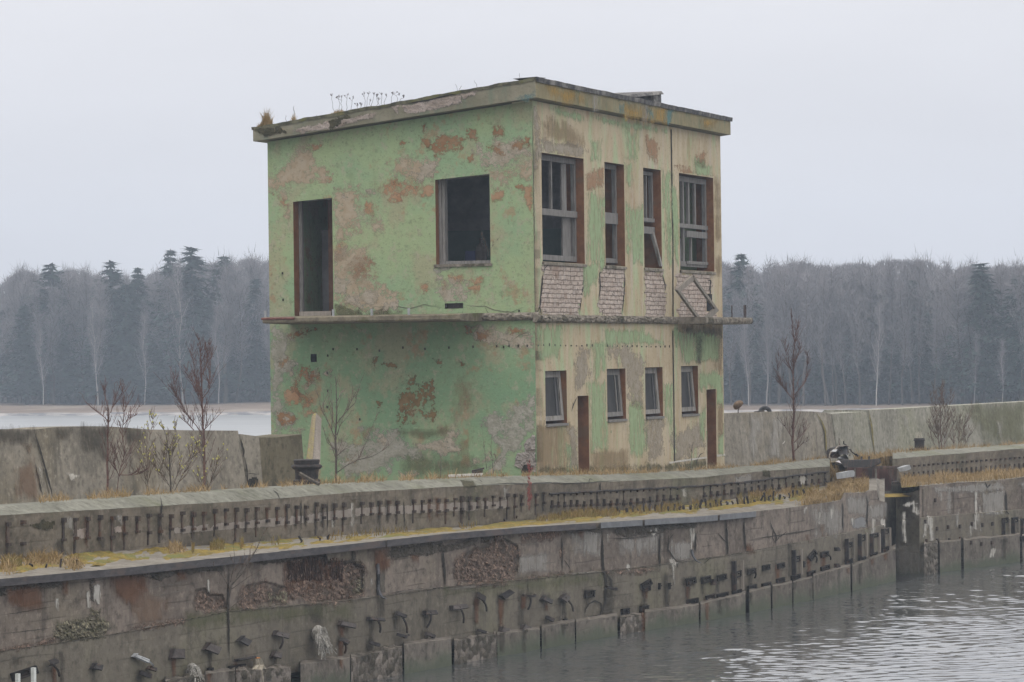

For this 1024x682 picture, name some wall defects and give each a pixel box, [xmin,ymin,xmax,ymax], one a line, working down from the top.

spalling [268,112,434,314]
spalling [391,91,717,317]
spalling [330,356,461,479]
spalling [473,395,536,474]